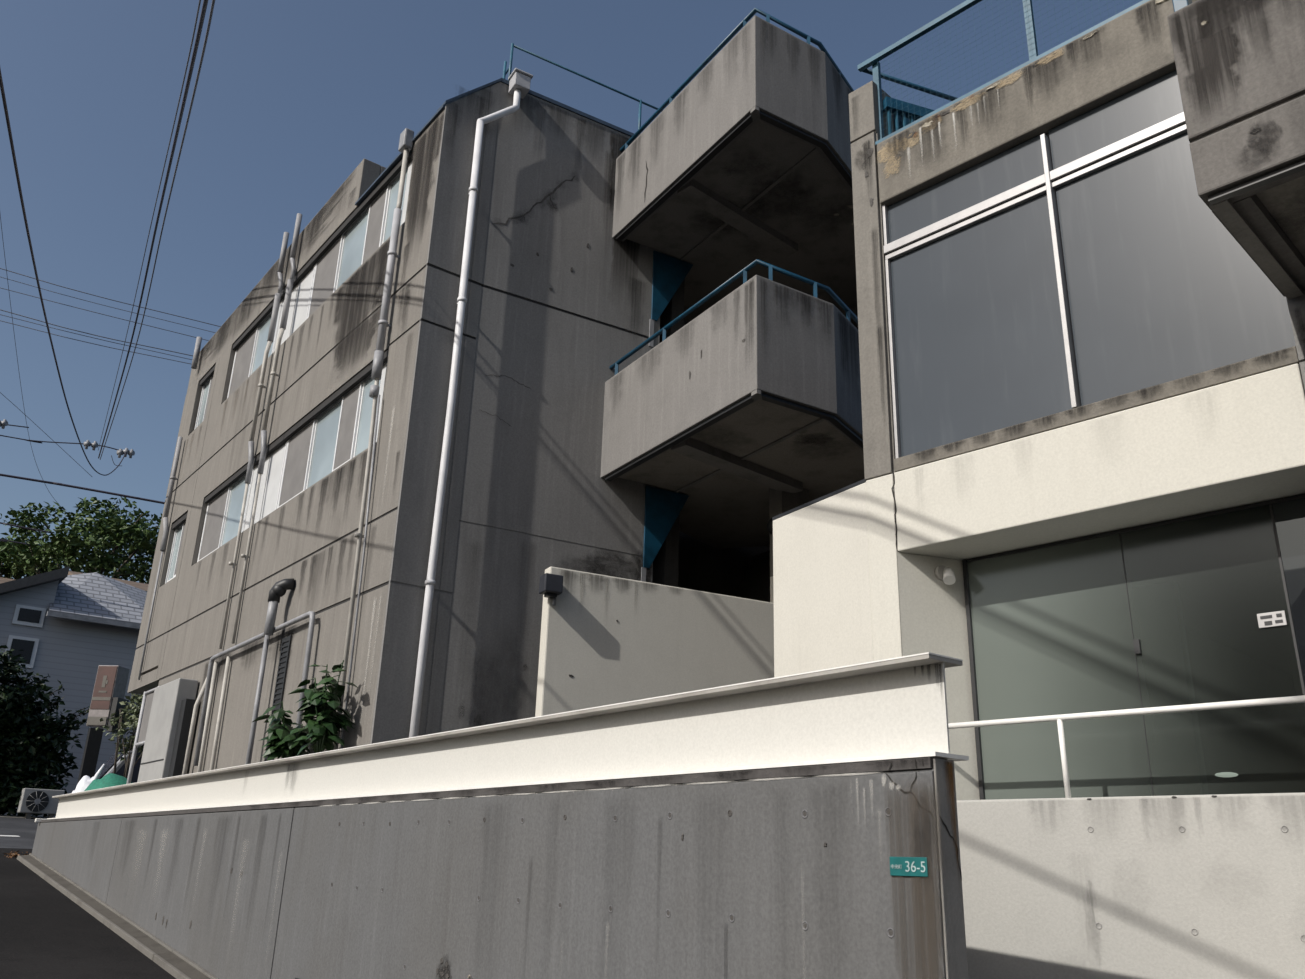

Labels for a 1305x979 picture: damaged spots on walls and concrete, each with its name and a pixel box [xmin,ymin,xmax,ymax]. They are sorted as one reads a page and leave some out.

peeling [865,50,1062,178]
crack [493,176,575,225]
water stain [321,240,390,361]
crack [890,471,898,549]
crack [885,759,962,880]